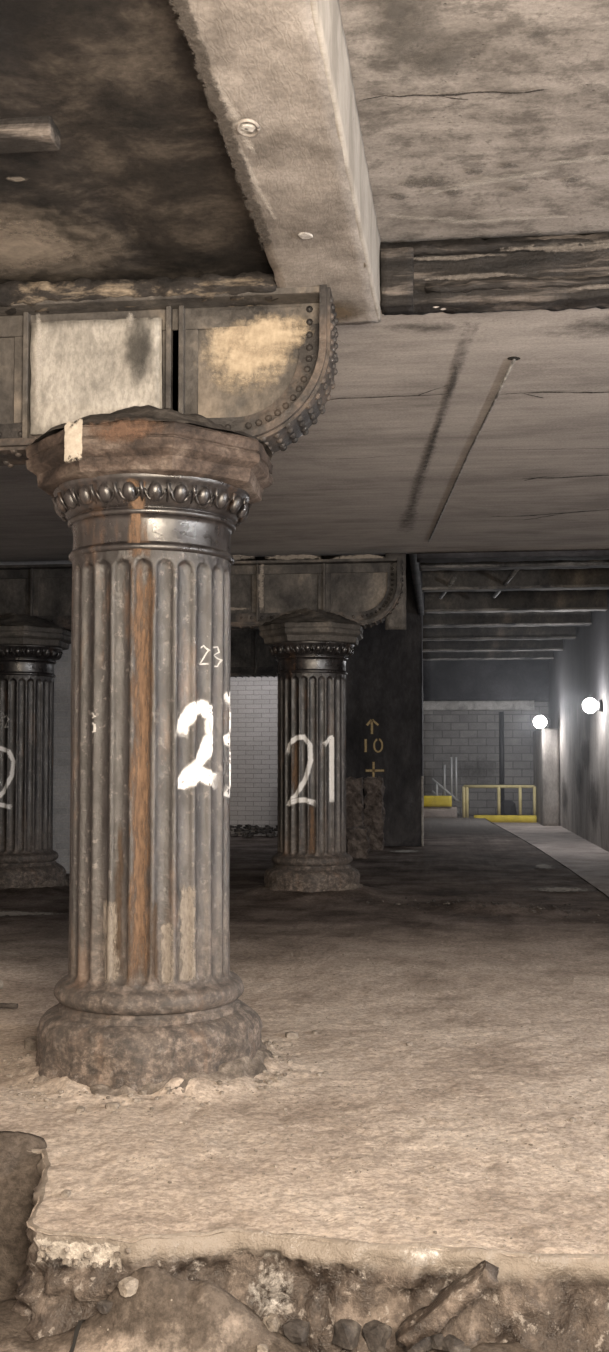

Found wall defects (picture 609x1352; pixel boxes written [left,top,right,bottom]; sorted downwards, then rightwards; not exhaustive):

corrosion [114,479,158,979]
spalling [12,1149,609,1352]